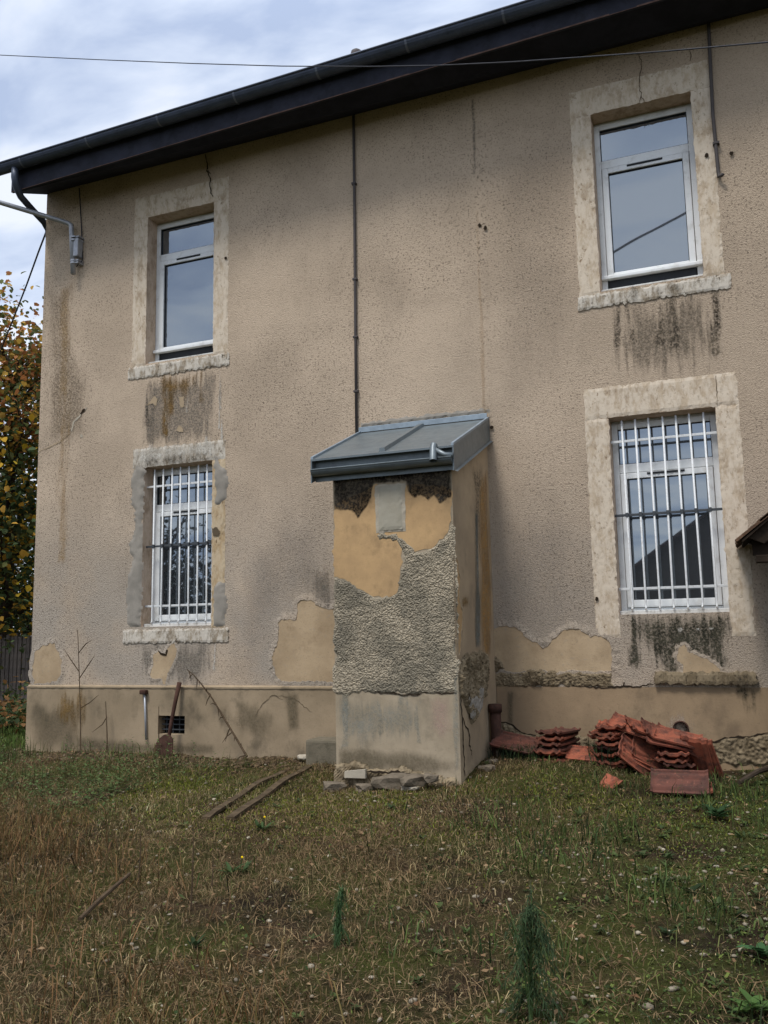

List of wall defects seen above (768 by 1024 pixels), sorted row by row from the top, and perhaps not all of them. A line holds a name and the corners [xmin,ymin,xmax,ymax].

crack [205,154,213,196]
damp [615,285,720,364]
damp [137,378,223,464]
peeling [332,484,453,597]
peeling [28,637,66,685]
peeling [148,642,180,686]
peeling [266,592,335,686]
peeling [453,547,622,724]
damp [629,623,641,666]
damp [654,619,688,662]
peeling [670,628,726,673]
damp [704,618,725,667]